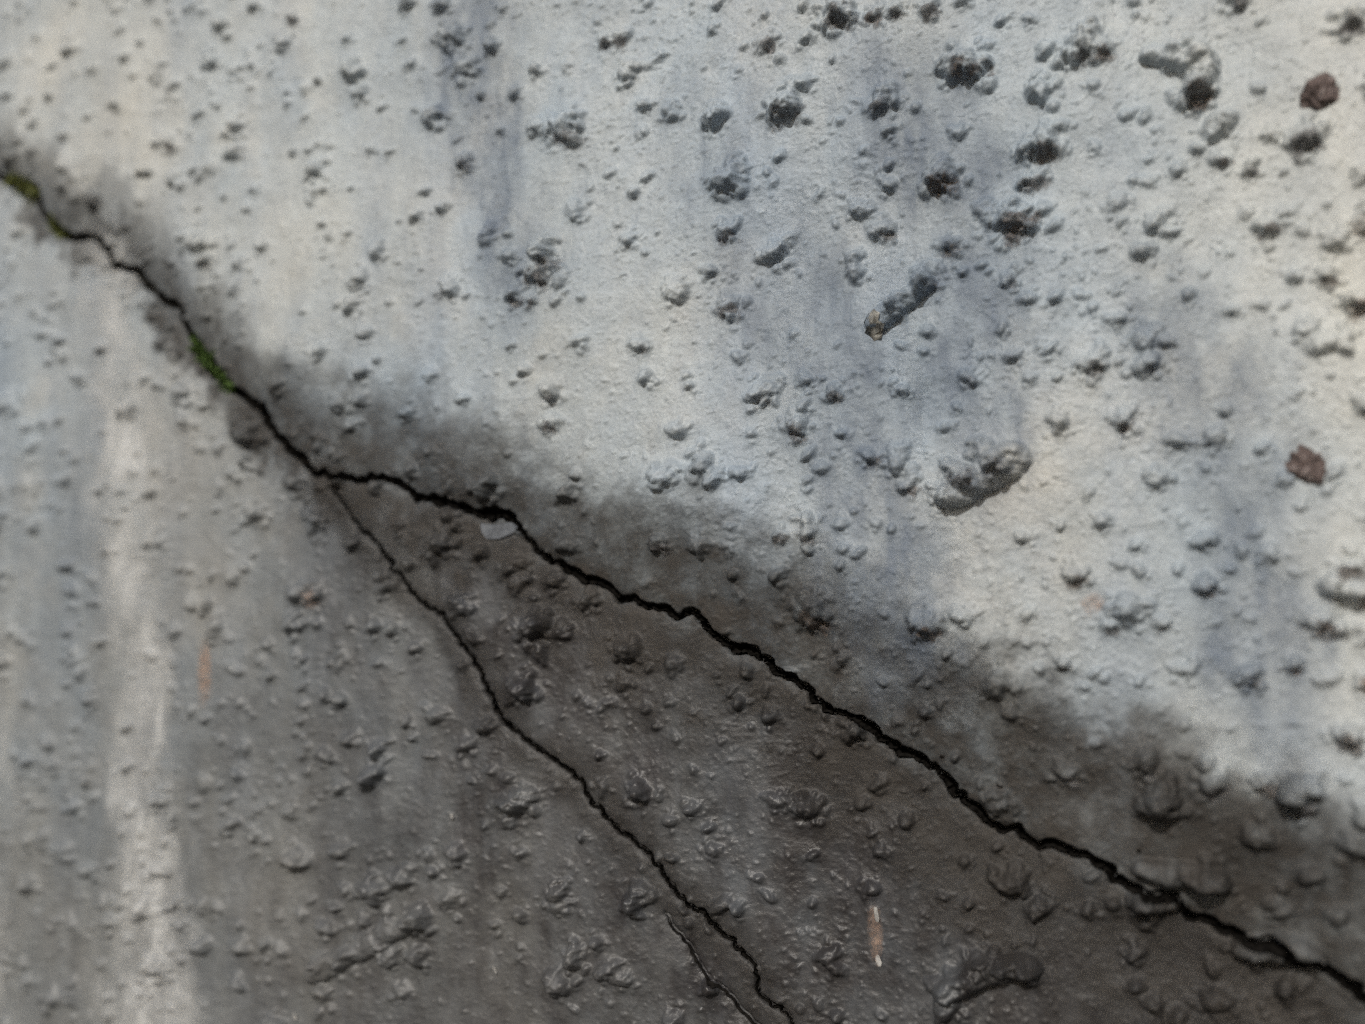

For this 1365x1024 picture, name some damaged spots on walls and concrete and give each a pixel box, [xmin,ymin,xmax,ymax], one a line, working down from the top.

crack [0,173,51,224]
crack [66,229,1365,1024]